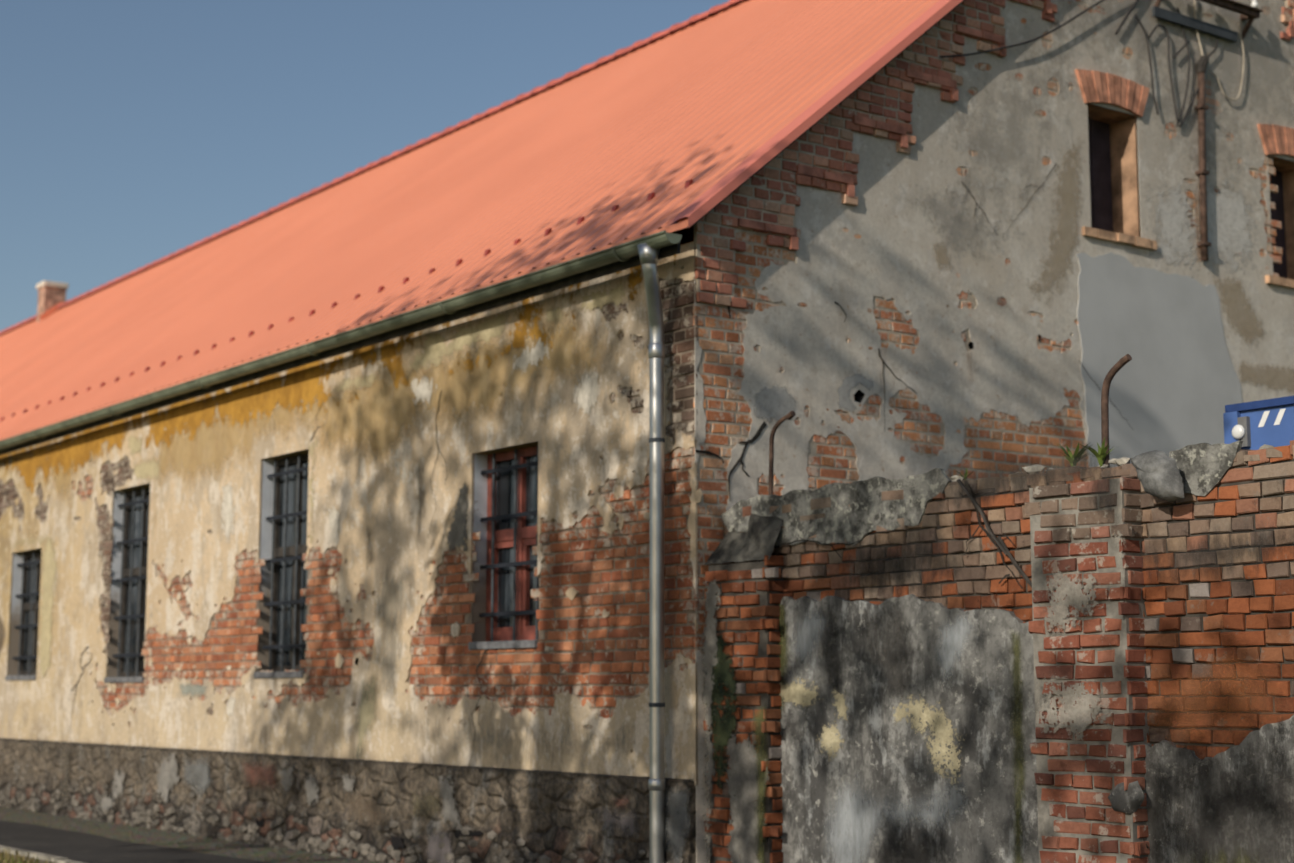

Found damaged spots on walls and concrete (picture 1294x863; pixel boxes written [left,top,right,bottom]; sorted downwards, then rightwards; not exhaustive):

flaking render [868,298,919,354]
flaking render [946,292,1007,316]
flaking render [1027,311,1072,353]
flaking render [794,388,1089,488]
flaking render [0,479,49,530]
flaking render [406,232,808,729]
flaking render [73,435,376,727]
water stain [796,610,841,691]
water stain [868,611,914,697]
water stain [937,618,970,675]
water stain [829,785,963,863]
water stain [1158,737,1294,863]